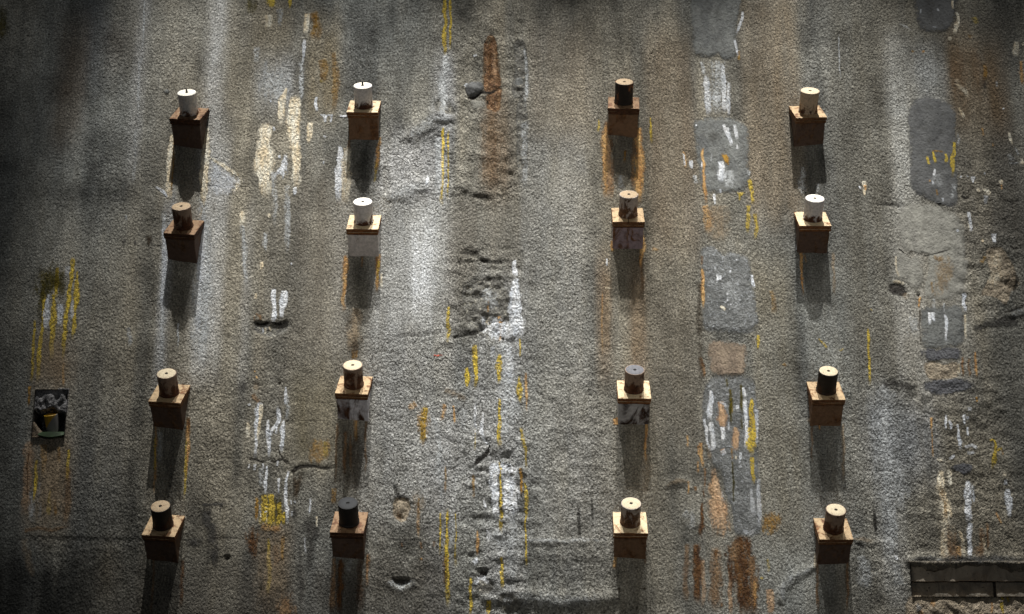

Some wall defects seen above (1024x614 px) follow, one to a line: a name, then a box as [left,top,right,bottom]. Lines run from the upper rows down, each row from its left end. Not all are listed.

leakage [253,14,351,241]
leakage [239,211,247,278]
spalling [253,313,290,336]
spalling [462,276,514,342]
leakage [246,387,296,525]
crack [250,448,330,496]
leakage [936,397,978,522]
leakage [307,499,319,565]
rust [688,443,759,610]
leakage [963,481,975,555]